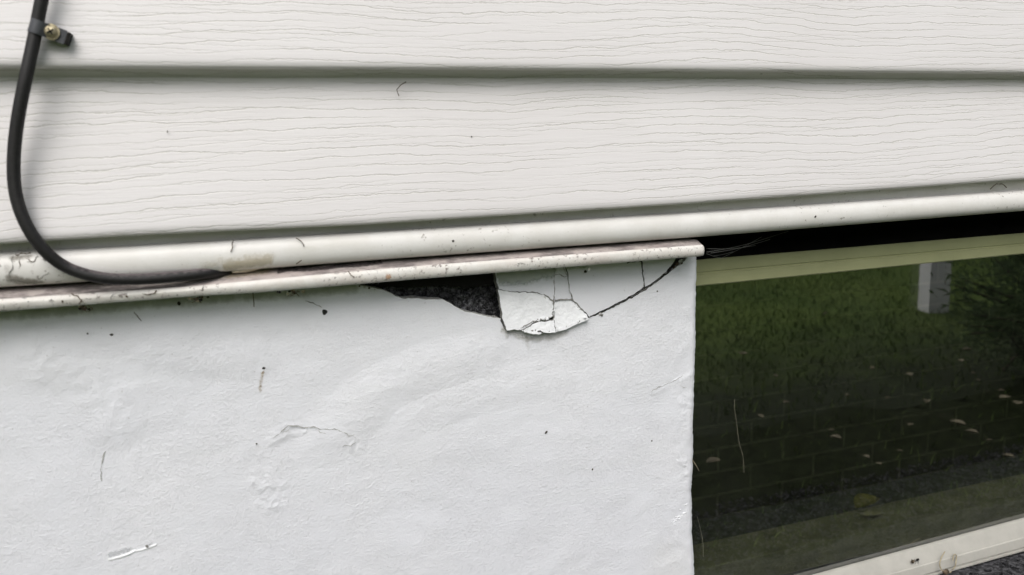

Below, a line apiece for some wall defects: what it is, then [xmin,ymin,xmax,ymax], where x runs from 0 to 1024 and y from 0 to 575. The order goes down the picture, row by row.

flaking render [359,258,676,334]
crack [522,258,686,332]
crack [264,421,366,463]